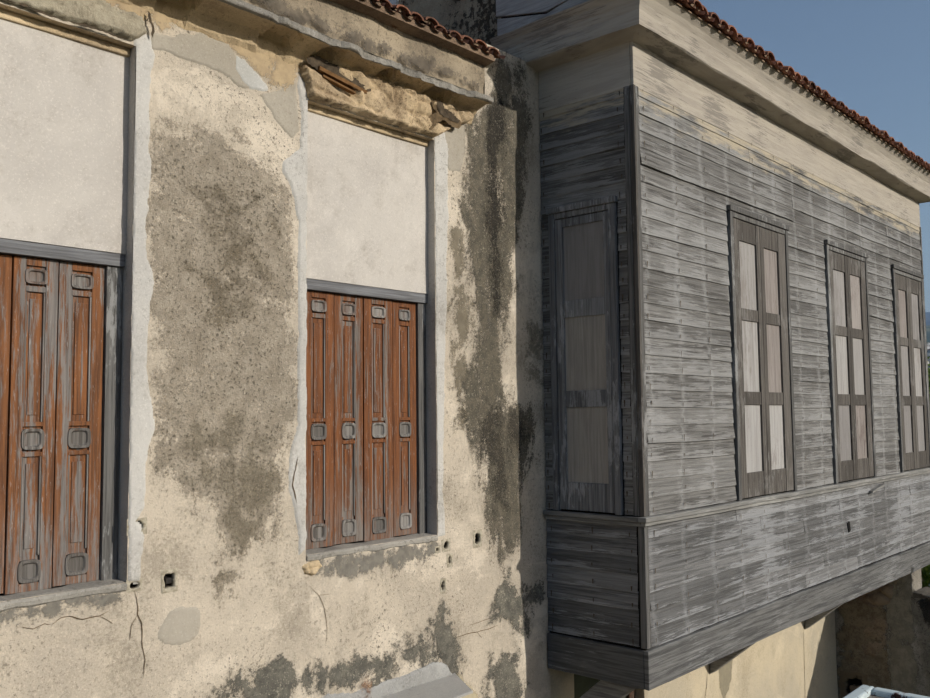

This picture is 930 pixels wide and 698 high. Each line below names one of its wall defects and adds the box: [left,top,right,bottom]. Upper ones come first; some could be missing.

flaking render [145,118,299,561]
water stain [448,52,546,698]
crack [23,590,146,677]
water stain [208,598,466,698]
flaking render [836,580,897,698]